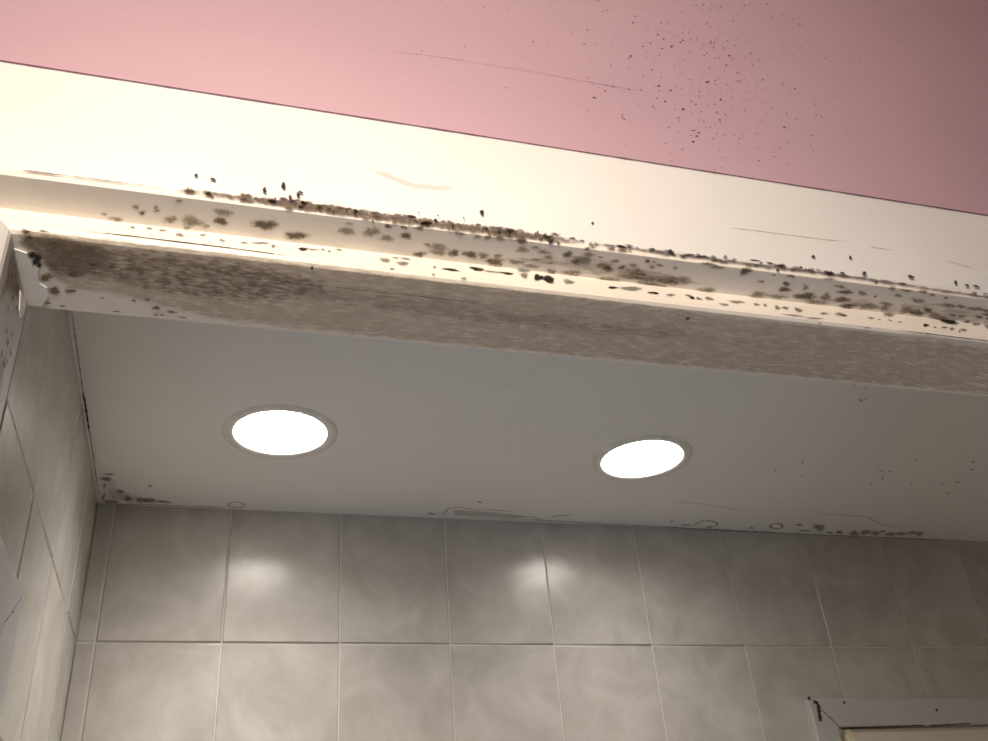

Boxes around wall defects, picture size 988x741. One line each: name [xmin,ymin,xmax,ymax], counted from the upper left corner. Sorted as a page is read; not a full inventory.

leakage [5,254,21,311]
leakage [22,178,988,391]